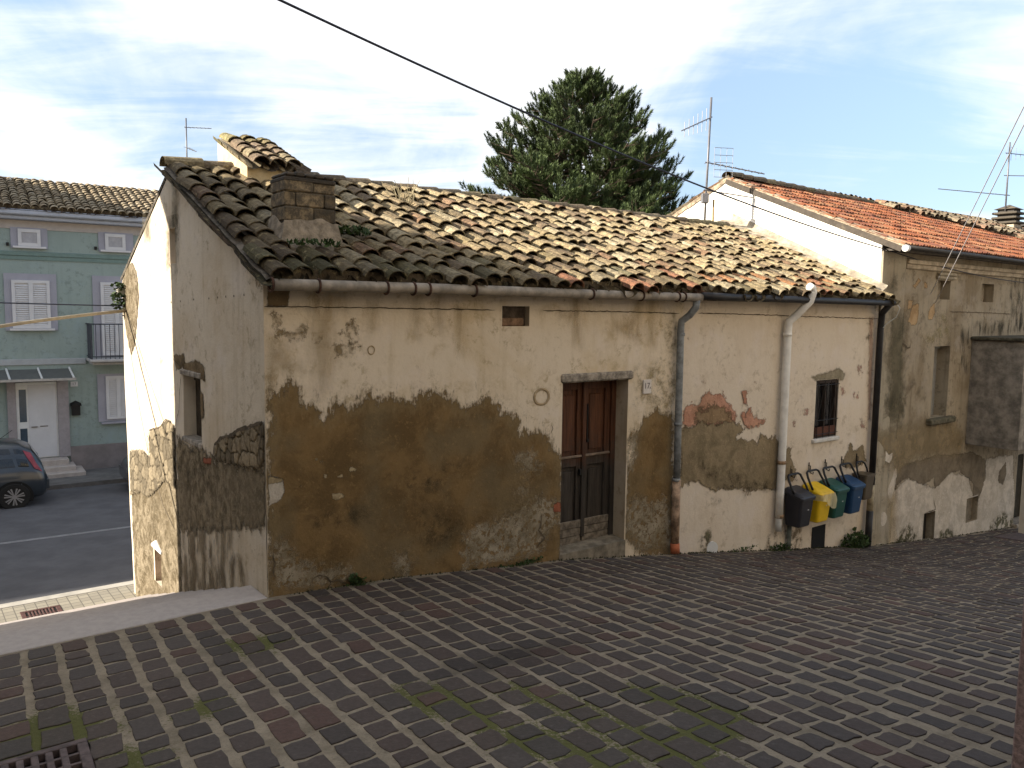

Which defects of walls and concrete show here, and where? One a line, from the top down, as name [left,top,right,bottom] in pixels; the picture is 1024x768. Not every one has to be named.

peeling [131,378,562,597]
peeling [625,389,797,556]
water stain [878,315,963,469]
peeling [894,452,986,499]